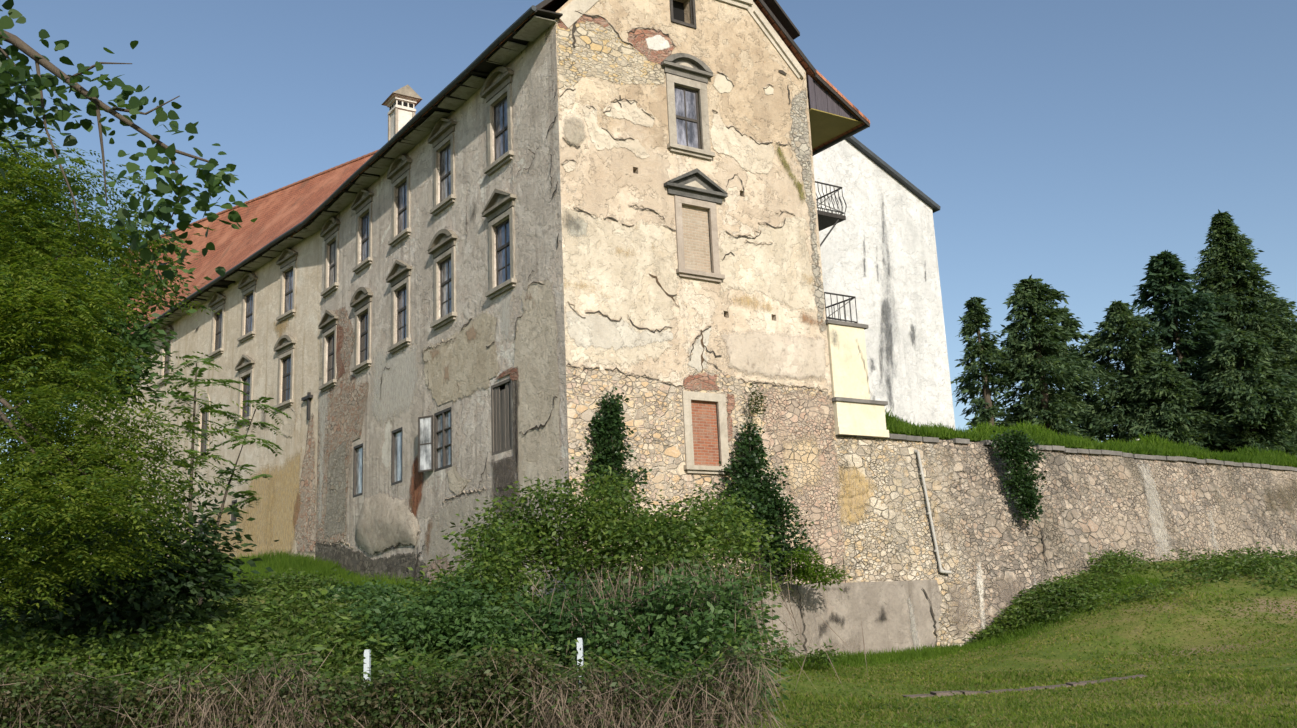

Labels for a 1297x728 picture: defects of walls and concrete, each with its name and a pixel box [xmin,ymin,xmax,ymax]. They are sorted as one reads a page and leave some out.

flaking render [556,9,677,159]
peeling [713,70,734,93]
peeling [710,91,827,331]
flaking render [282,307,503,589]
flaking render [422,203,847,598]
crack [649,273,679,307]
crack [700,330,722,372]
water stain [871,300,894,407]